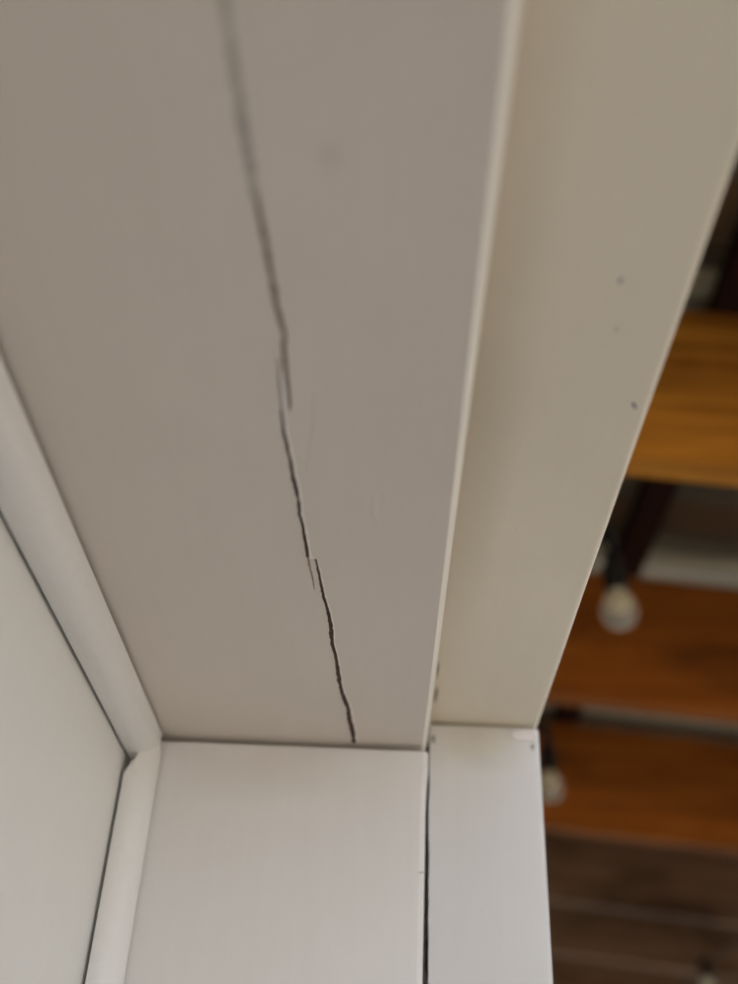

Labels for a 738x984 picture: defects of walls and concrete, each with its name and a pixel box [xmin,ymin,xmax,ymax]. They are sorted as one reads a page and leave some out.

crack [219,0,357,743]